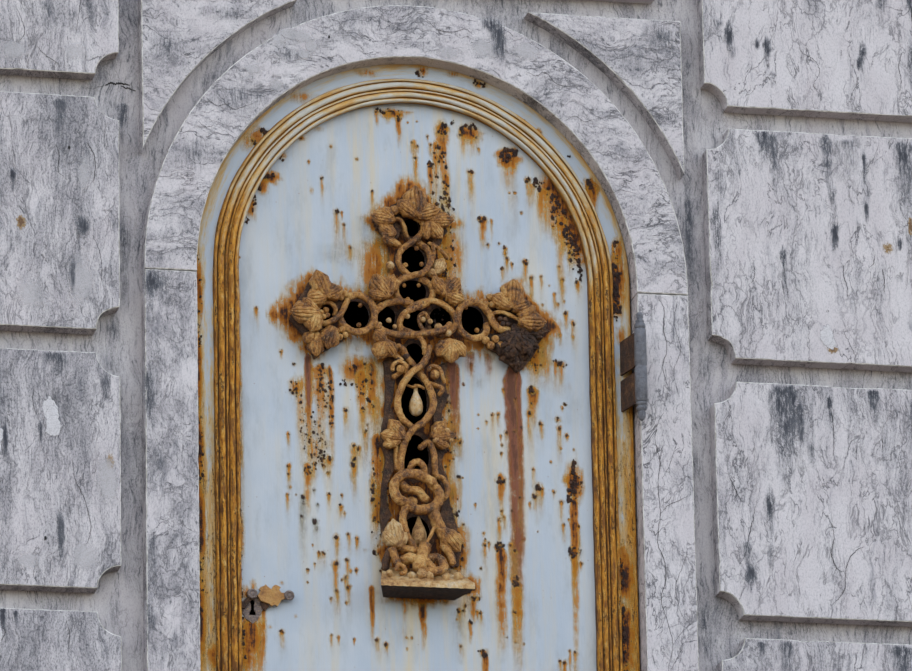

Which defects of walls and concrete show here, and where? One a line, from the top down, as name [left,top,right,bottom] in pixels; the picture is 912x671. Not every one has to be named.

corrosion [375,107,417,136]
corrosion [340,120,480,310]
corrosion [496,147,523,176]
corrosion [581,178,600,208]
corrosion [611,239,626,343]
corrosion [477,174,585,644]
corrosion [197,255,216,668]
corrosion [269,271,506,636]
corrosion [242,610,265,671]
corrosion [369,585,388,649]
corrosion [391,598,448,649]
corrosion [477,649,489,671]